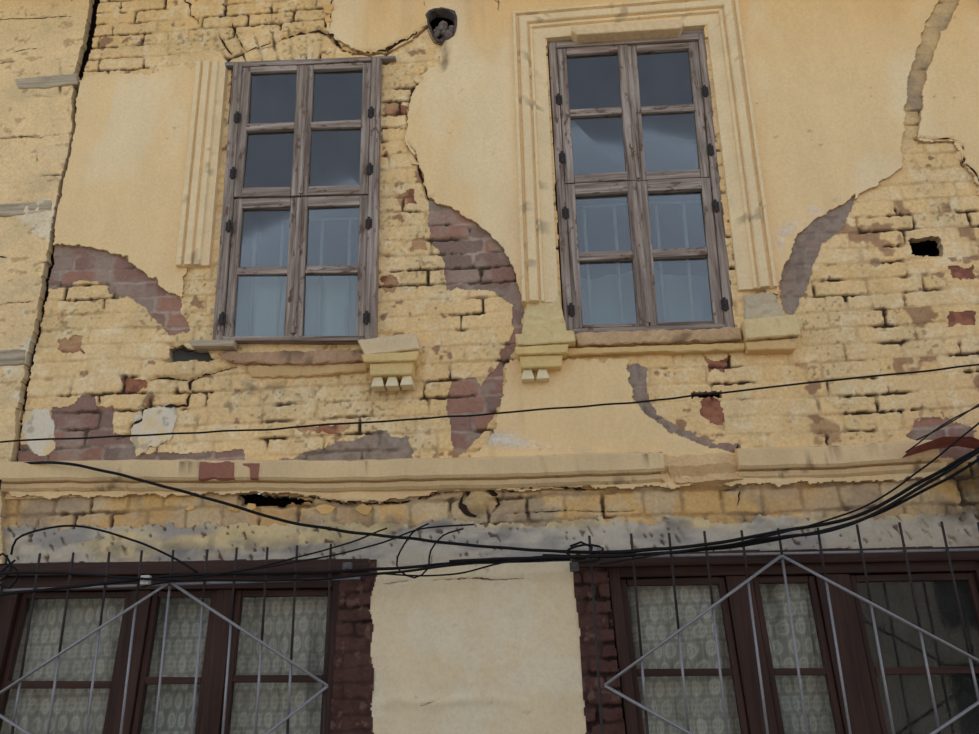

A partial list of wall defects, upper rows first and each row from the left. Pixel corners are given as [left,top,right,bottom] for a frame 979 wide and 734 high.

crack [0,0,100,125]
crack [0,236,55,461]
spalling [3,0,979,531]